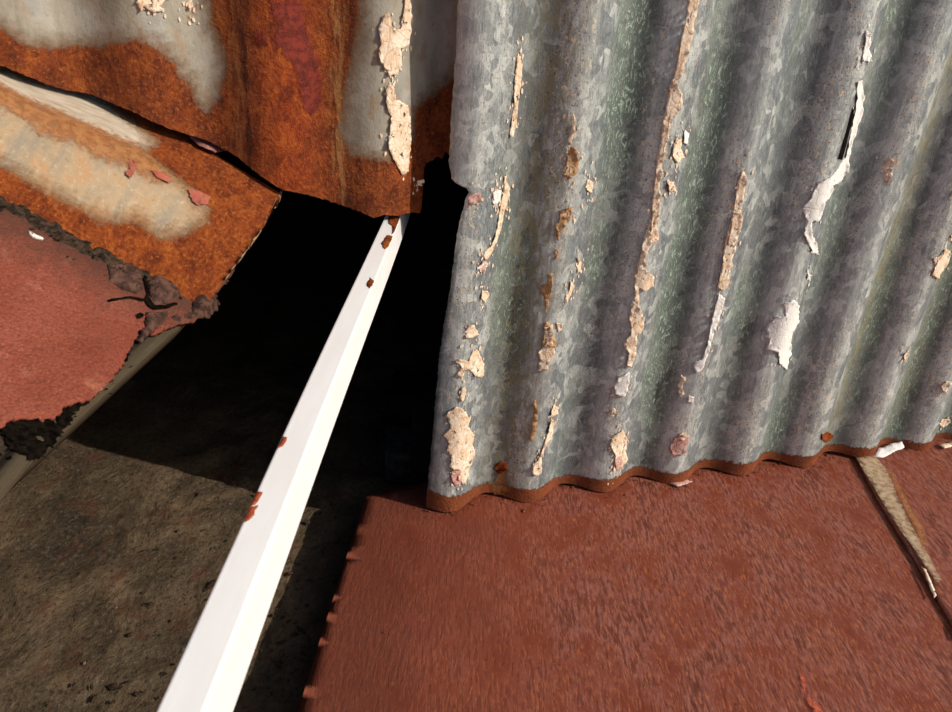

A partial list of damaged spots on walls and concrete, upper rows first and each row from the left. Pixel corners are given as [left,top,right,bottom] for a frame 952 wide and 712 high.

corrosion [0,0,454,302]
peeling [372,0,424,195]
peeling [468,167,514,310]
peeling [507,36,527,137]
peeling [603,0,699,485]
peeling [678,151,754,403]
peeling [761,15,875,369]
crack [838,108,855,160]
peeling [923,235,952,291]
peeling [443,321,485,491]
corrosion [244,491,263,522]
corrosion [426,432,952,582]